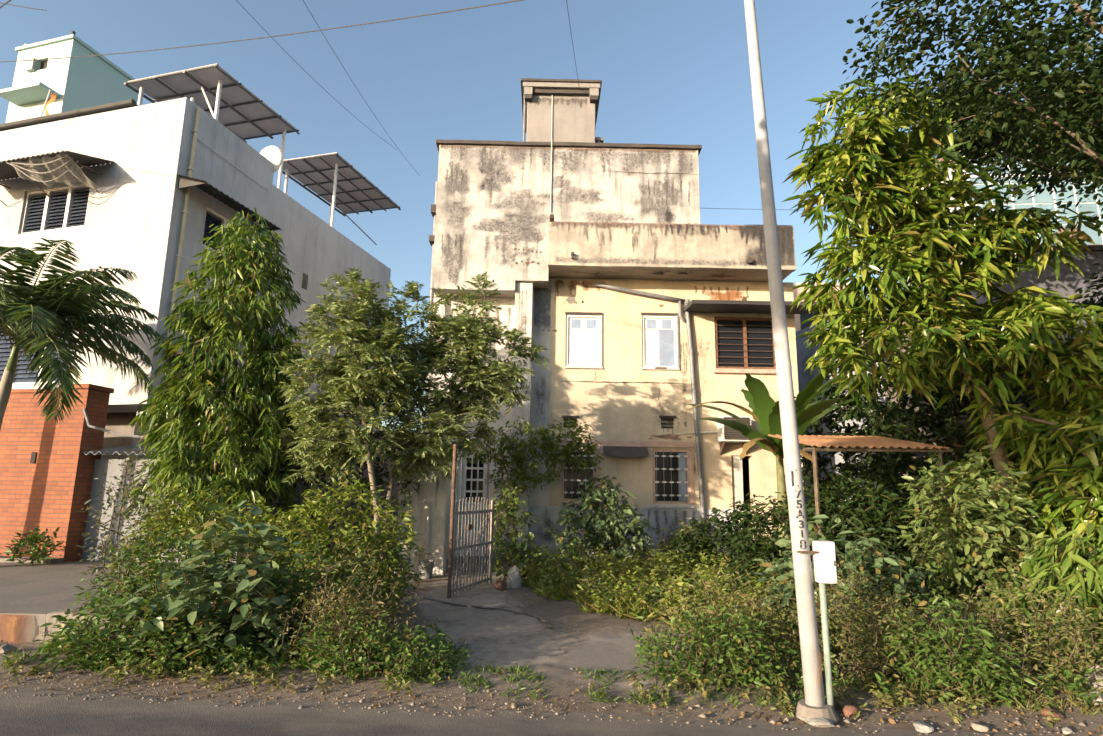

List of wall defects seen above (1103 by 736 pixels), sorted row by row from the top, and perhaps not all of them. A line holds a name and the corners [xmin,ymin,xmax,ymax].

leakage [442,148,767,285]
leakage [777,225,794,265]
corrosion [695,274,748,300]